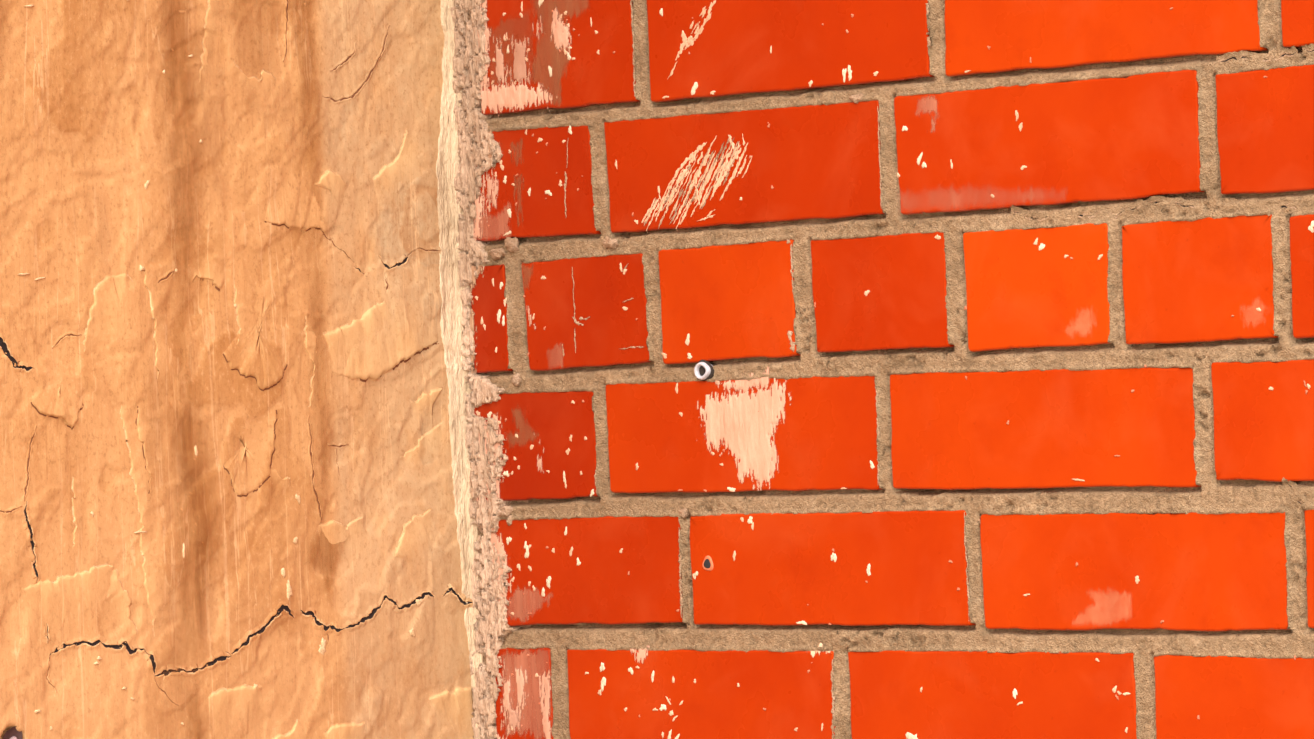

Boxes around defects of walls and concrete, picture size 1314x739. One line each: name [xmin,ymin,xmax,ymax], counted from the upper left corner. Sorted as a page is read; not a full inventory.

crack [157,267,178,284]
crack [0,331,84,375]
crack [0,425,41,584]
crack [43,584,473,708]